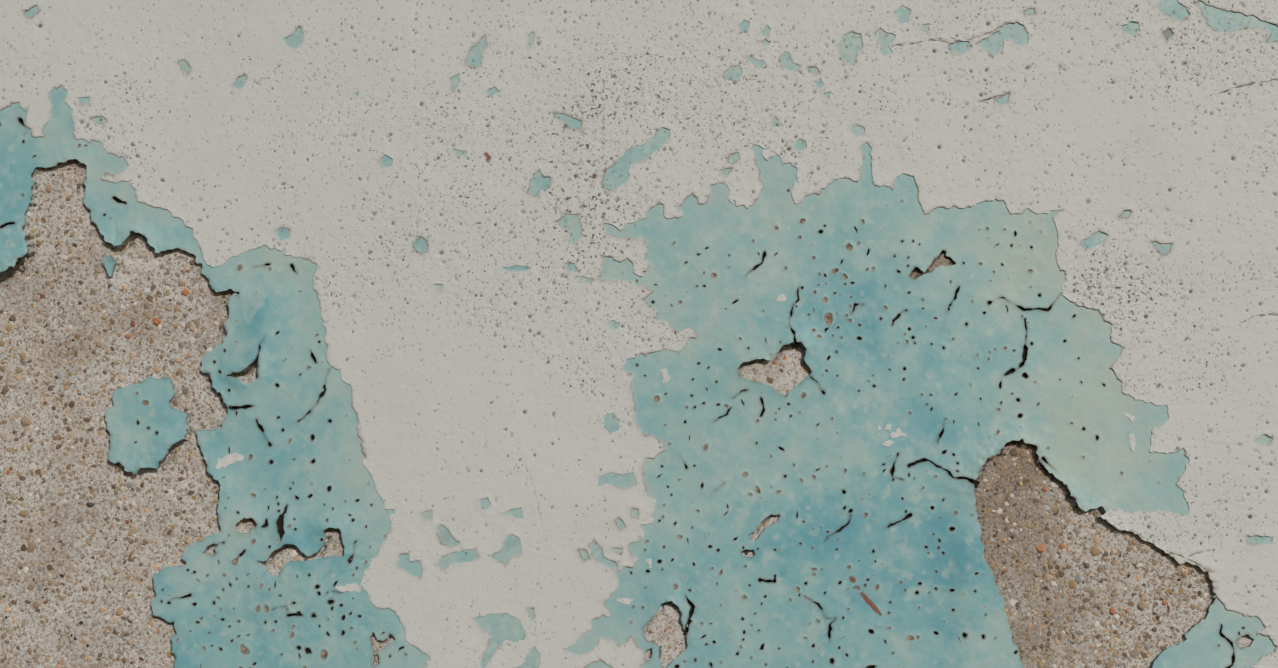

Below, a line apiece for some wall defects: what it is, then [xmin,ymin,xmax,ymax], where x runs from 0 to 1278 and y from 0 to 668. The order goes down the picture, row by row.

peeling [949,8,1035,57]
peeling [1157,0,1278,42]
peeling [0,86,430,668]
peeling [558,125,1276,668]